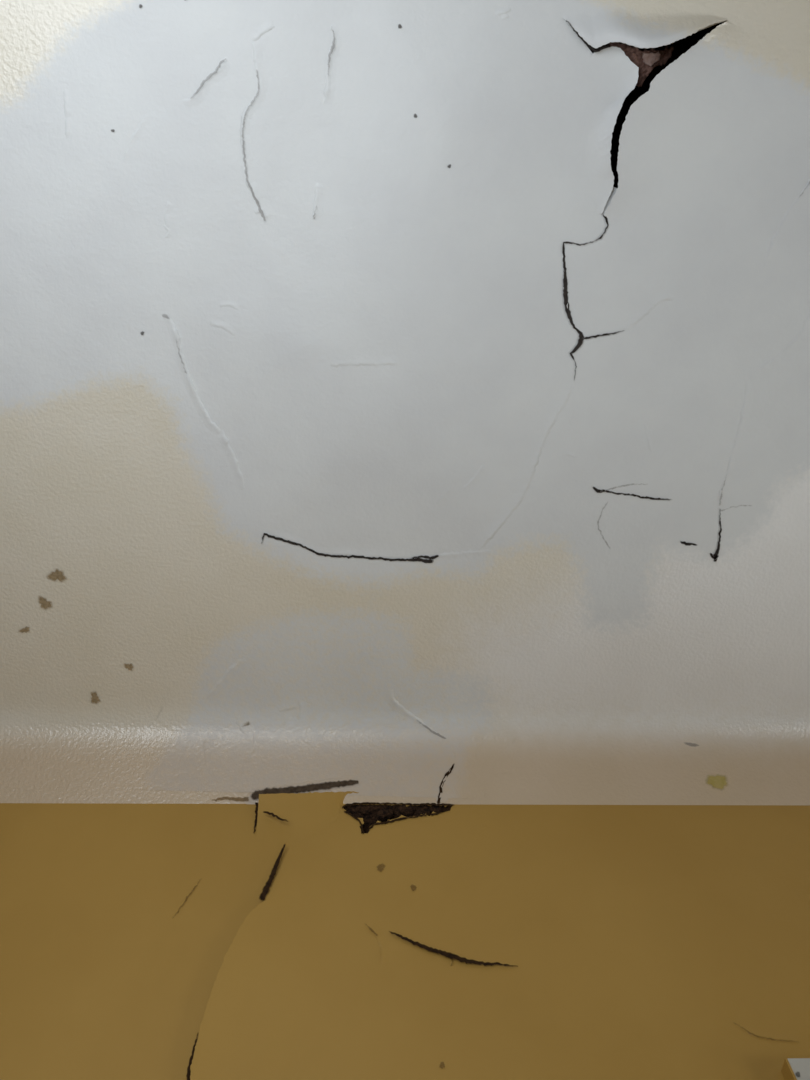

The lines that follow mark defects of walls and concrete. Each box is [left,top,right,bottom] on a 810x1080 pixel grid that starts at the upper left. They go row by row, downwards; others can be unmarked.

spalling [587,22,723,188]
crack [593,487,670,500]
crack [262,527,493,563]
crack [681,516,722,562]
peeling [186,762,461,1080]
crack [369,922,518,977]